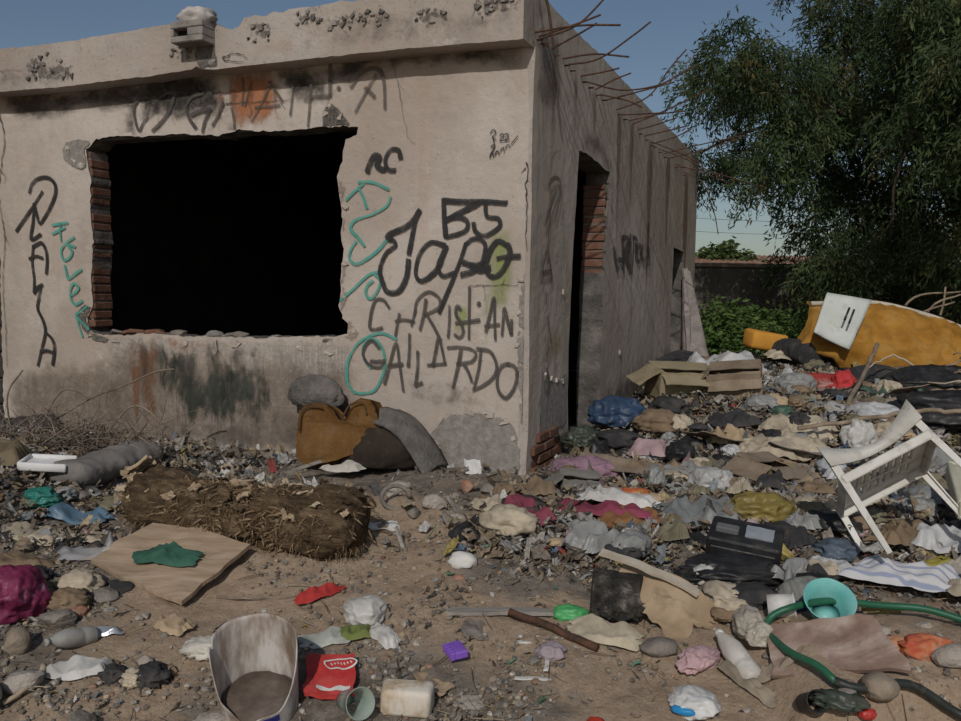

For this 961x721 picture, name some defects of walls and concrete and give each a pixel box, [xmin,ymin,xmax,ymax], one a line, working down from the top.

peeling [295,8,389,31]
peeling [414,8,447,23]
water stain [16,352,343,449]